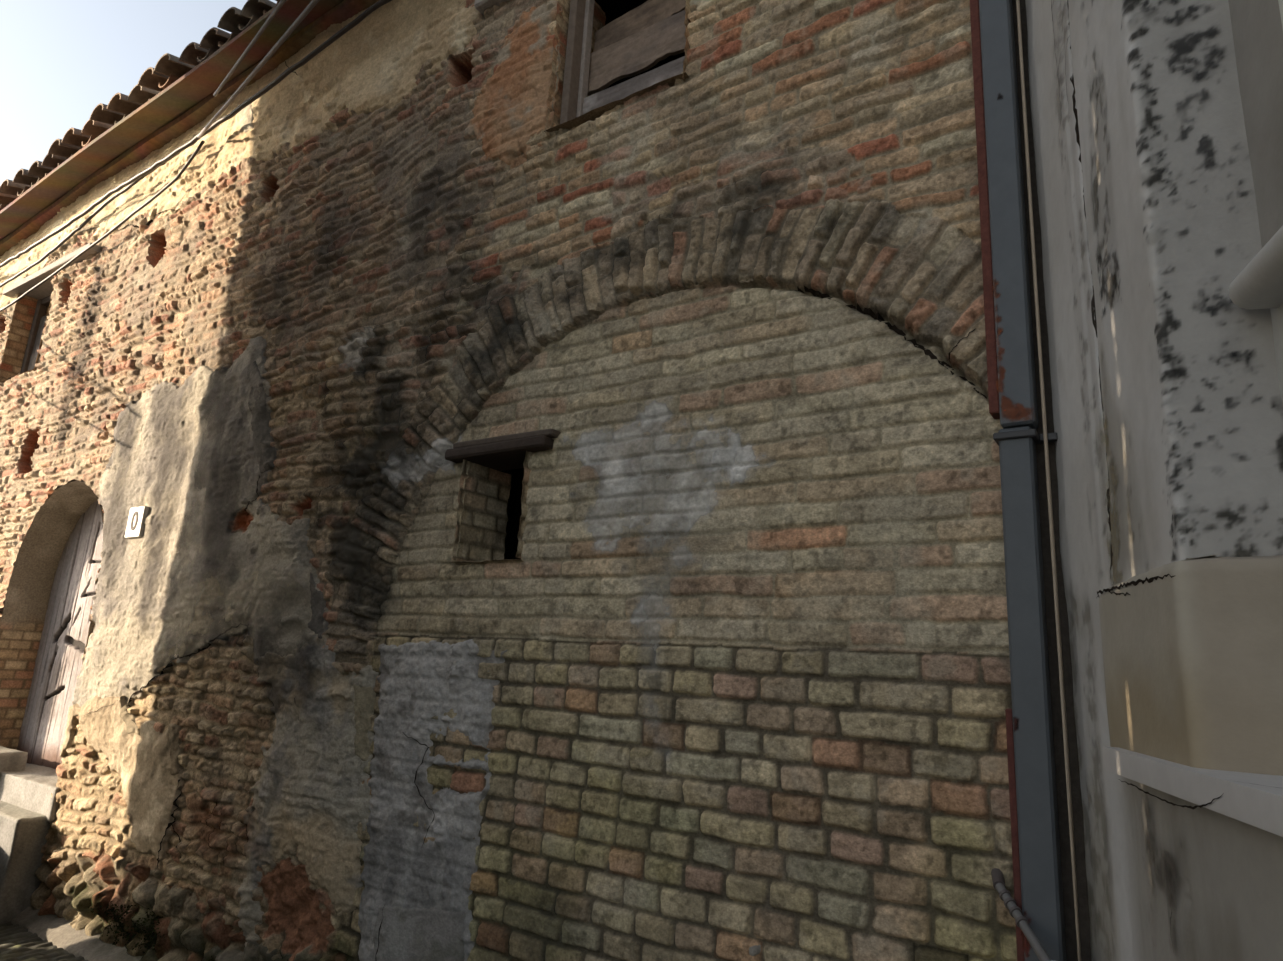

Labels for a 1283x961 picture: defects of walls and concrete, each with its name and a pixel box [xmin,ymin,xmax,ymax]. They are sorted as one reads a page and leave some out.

crack [1051,2,1086,217]
damp [1121,0,1224,204]
crack [1091,270,1103,410]
damp [1154,292,1185,390]
damp [1203,296,1232,316]
damp [307,328,455,619]
damp [572,402,756,551]
crack [1097,471,1174,597]
damp [1166,443,1200,491]
damp [1208,508,1244,529]
damp [1234,544,1255,557]
peeling [60,336,379,961]